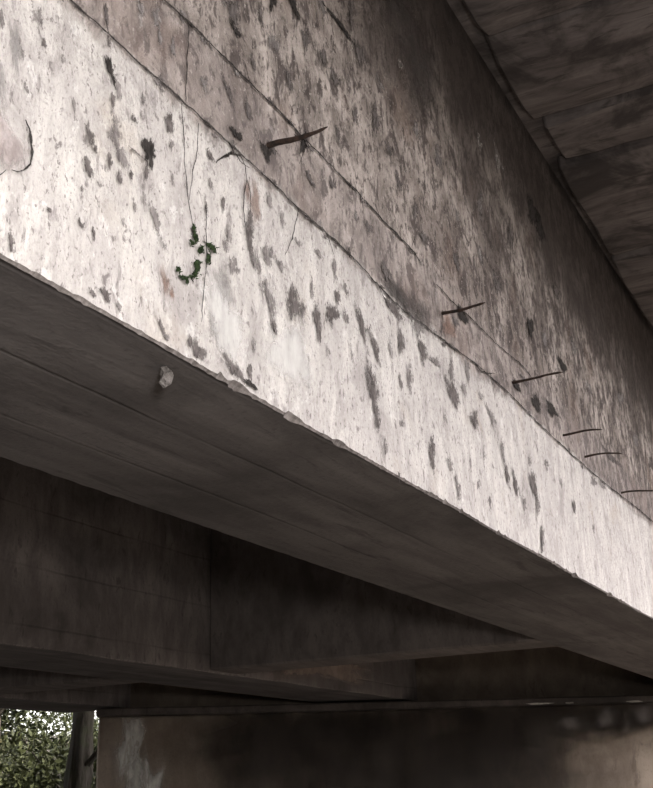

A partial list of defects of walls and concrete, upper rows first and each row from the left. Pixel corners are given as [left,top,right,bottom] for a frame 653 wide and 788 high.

crack [0,120,34,175]
peeling [244,211,283,335]
crack [63,0,653,522]
leakage [207,274,241,358]
leakage [355,302,405,430]
leakage [399,363,414,394]
leakage [389,283,440,367]
spalling [0,226,653,619]
leakage [501,443,540,515]